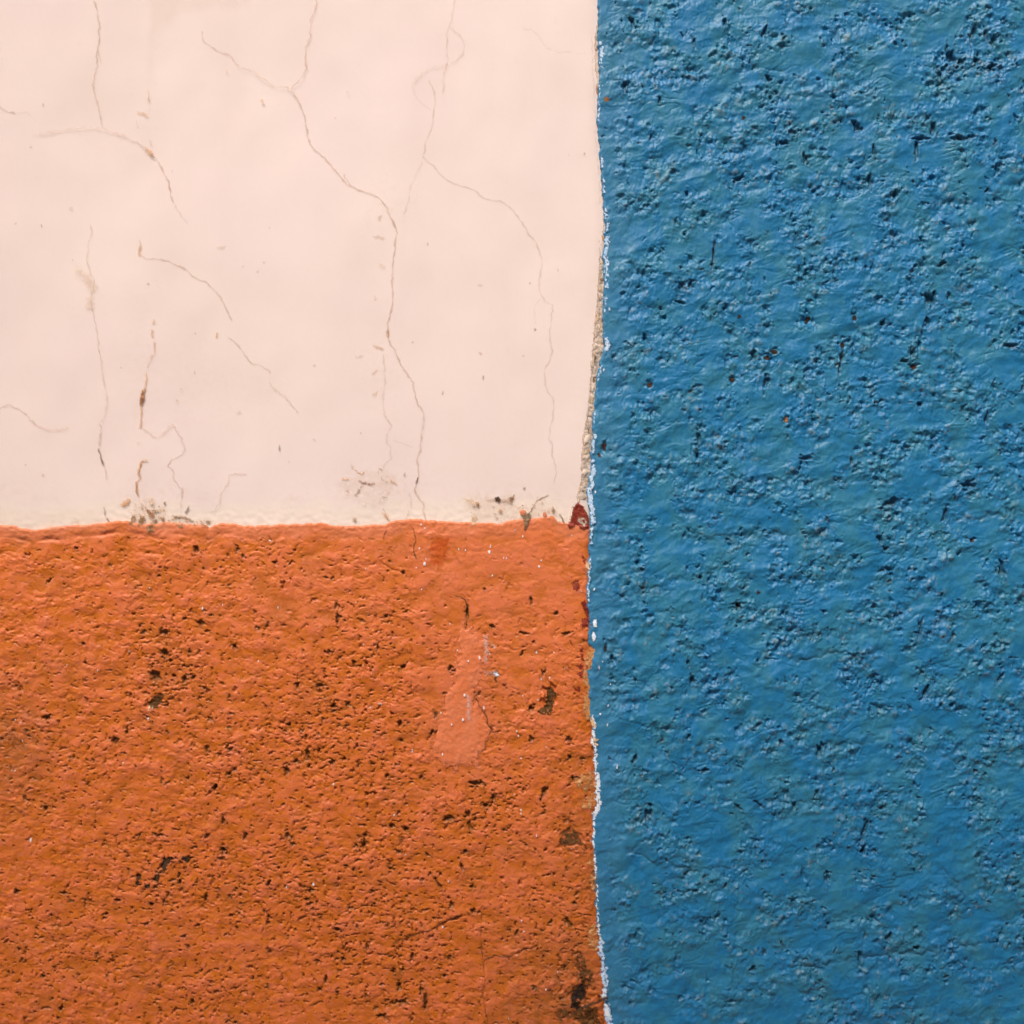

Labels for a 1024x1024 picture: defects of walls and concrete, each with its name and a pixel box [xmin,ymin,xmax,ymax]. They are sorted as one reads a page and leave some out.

spalling [594,25,609,122]
spalling [472,157,610,544]